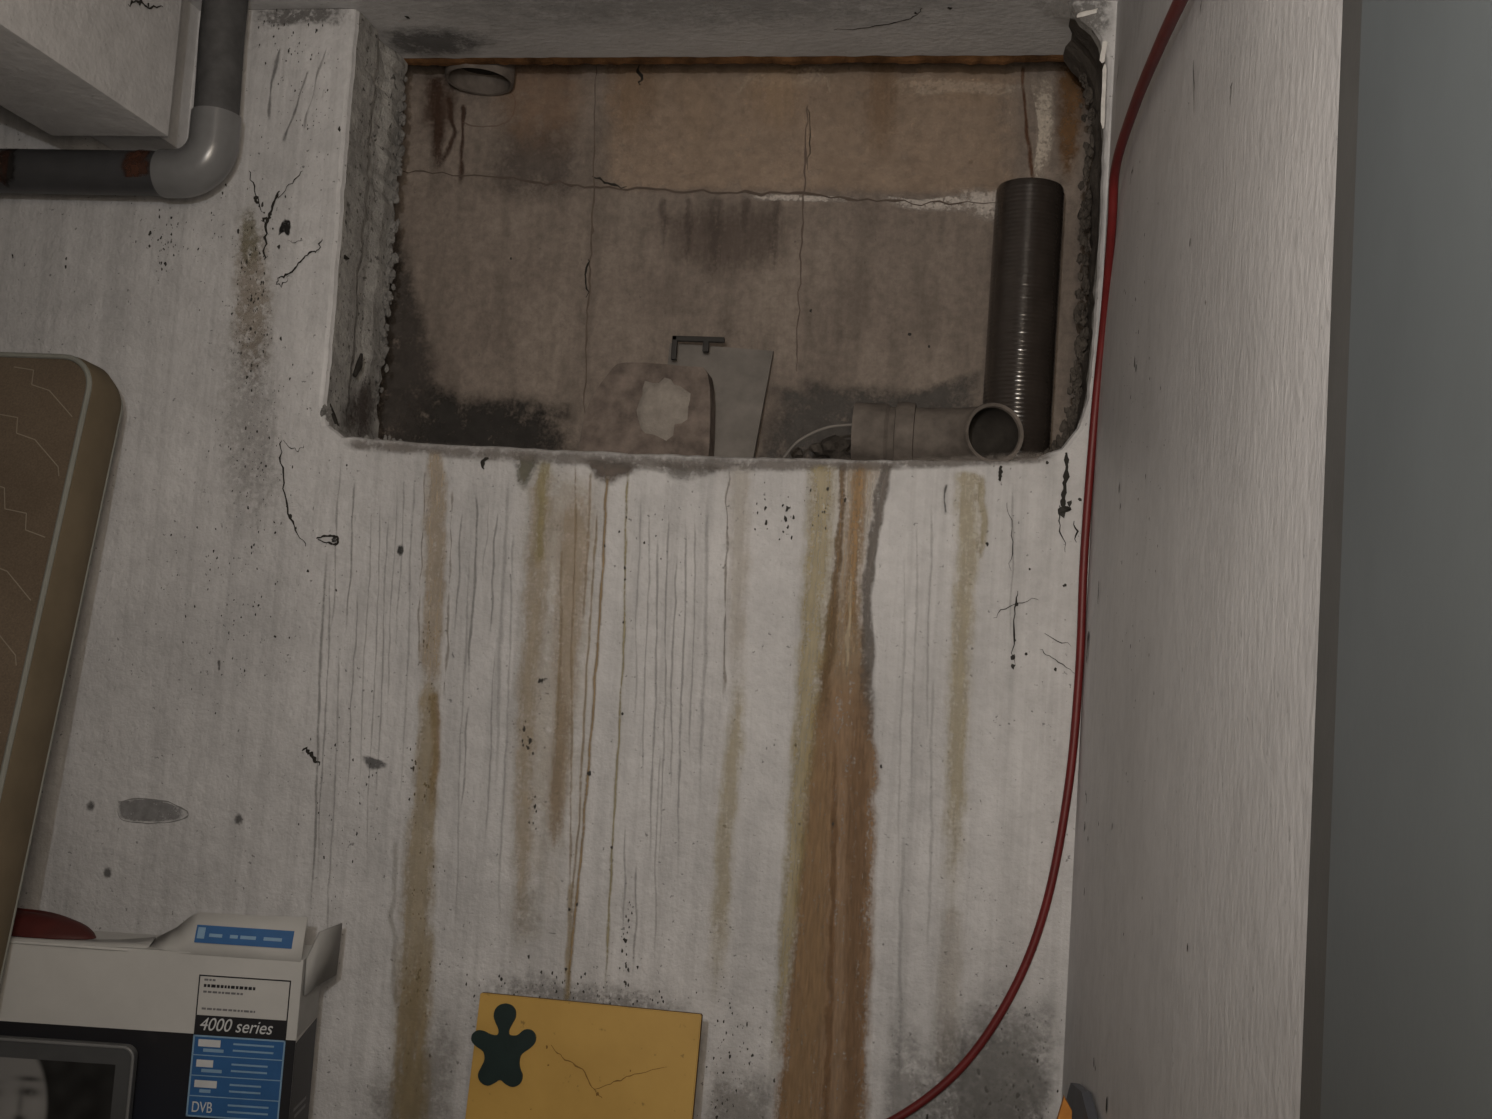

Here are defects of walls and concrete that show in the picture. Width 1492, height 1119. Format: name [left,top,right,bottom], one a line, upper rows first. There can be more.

water stain [1041,1,1108,30]
crack [249,171,322,287]
crack [403,65,995,412]
water stain [135,178,293,591]
water stain [344,245,563,450]
corrosion [405,683,439,823]
corrosion [773,466,882,1119]